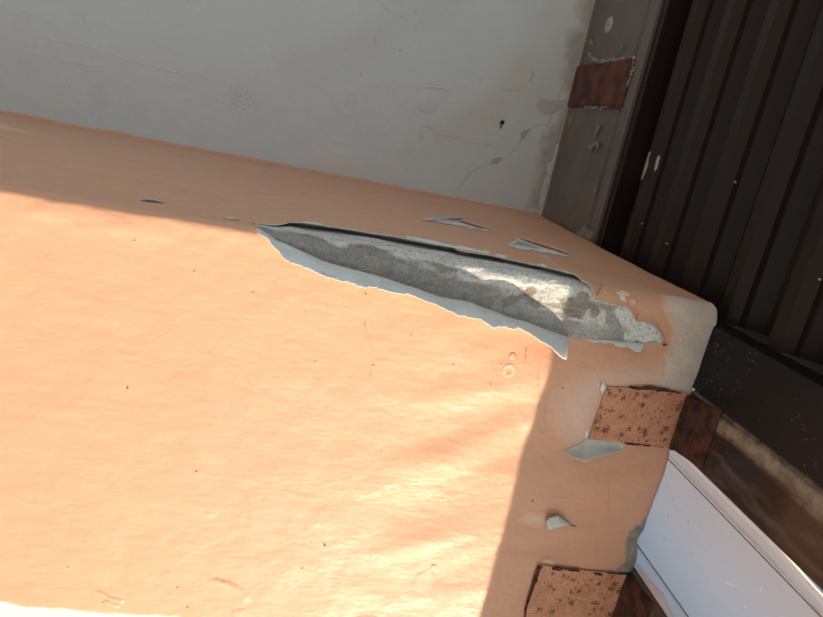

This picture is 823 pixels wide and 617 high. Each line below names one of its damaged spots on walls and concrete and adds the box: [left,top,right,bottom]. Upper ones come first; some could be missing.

peeling [422,215,490,231]
peeling [256,222,717,395]
corrosion [589,385,687,448]
peeling [564,430,624,462]
peeling [546,516,576,530]
corrosion [523,565,631,617]